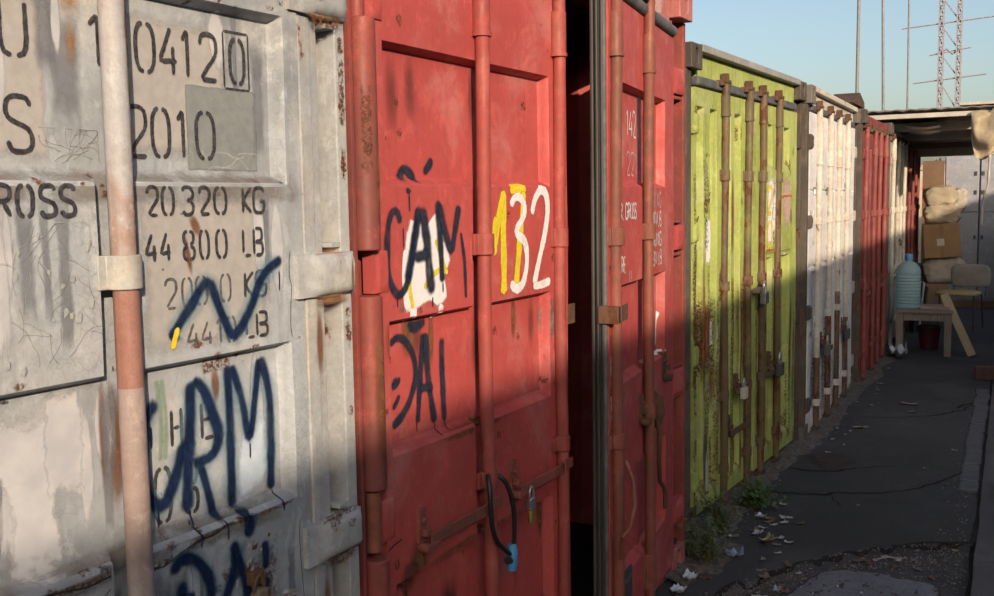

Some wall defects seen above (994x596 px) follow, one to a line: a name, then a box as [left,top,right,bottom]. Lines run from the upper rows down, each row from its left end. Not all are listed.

corrosion [312,14,344,125]
corrosion [321,294,351,341]
crack [714,380,993,596]